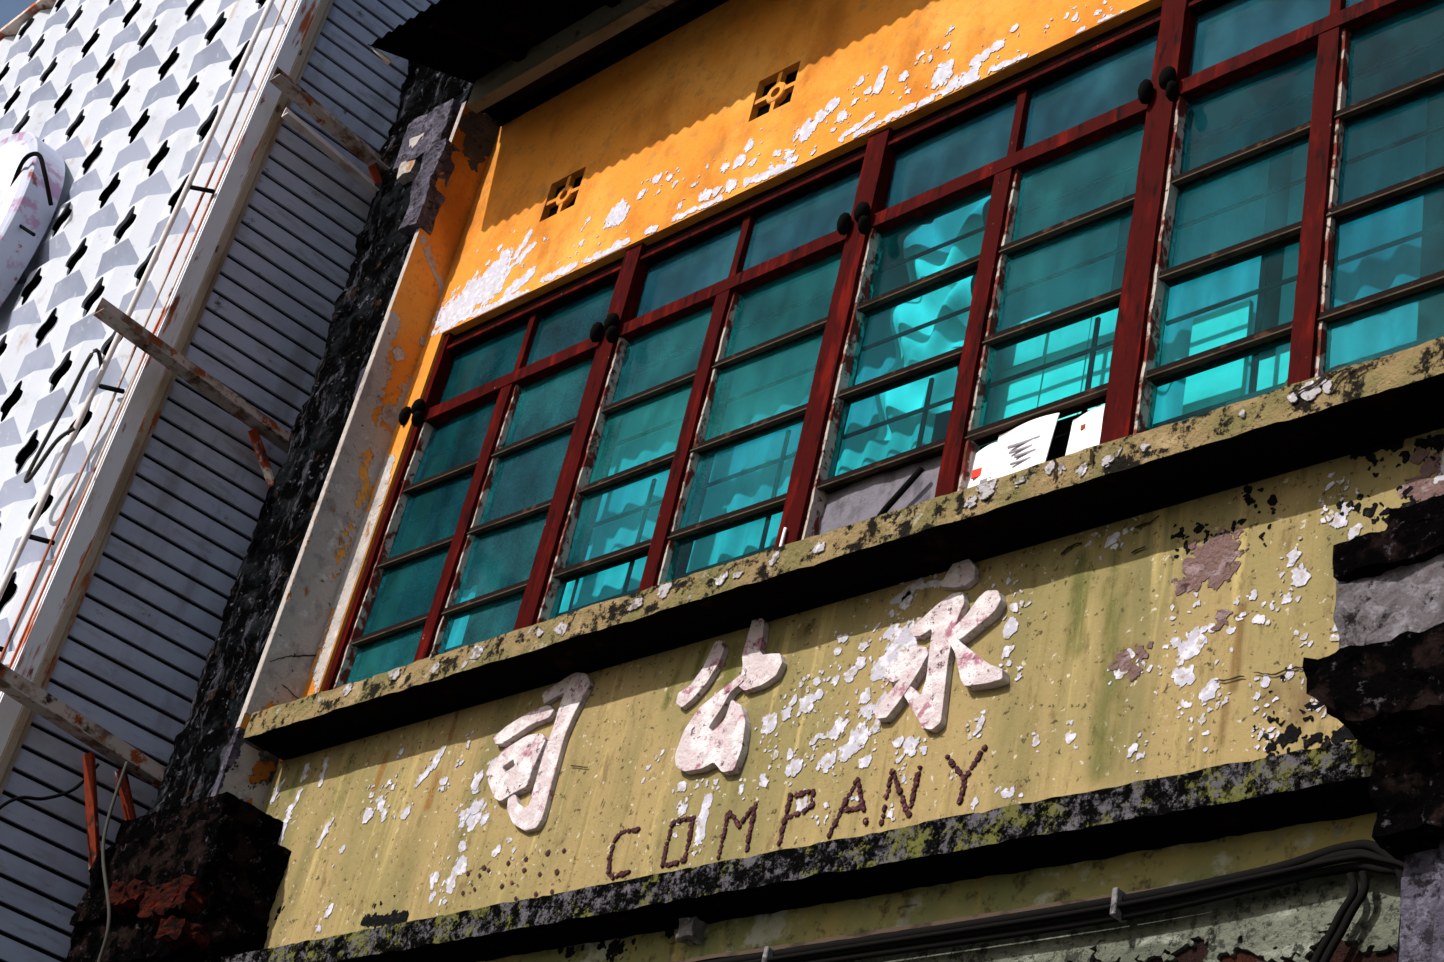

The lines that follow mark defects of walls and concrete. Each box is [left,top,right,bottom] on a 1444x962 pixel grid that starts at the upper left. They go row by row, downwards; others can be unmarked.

peeling [1044,0,1125,34]
peeling [245,23,1032,716]
peeling [1045,448,1123,478]
peeling [1319,472,1363,540]
peeling [1085,518,1137,561]
spalling [1107,527,1312,752]
peeling [1294,624,1339,647]
peeling [966,710,986,740]
peeling [1065,720,1079,749]
peeling [1124,732,1155,773]
peeling [1249,664,1327,752]
peeling [995,786,1024,799]